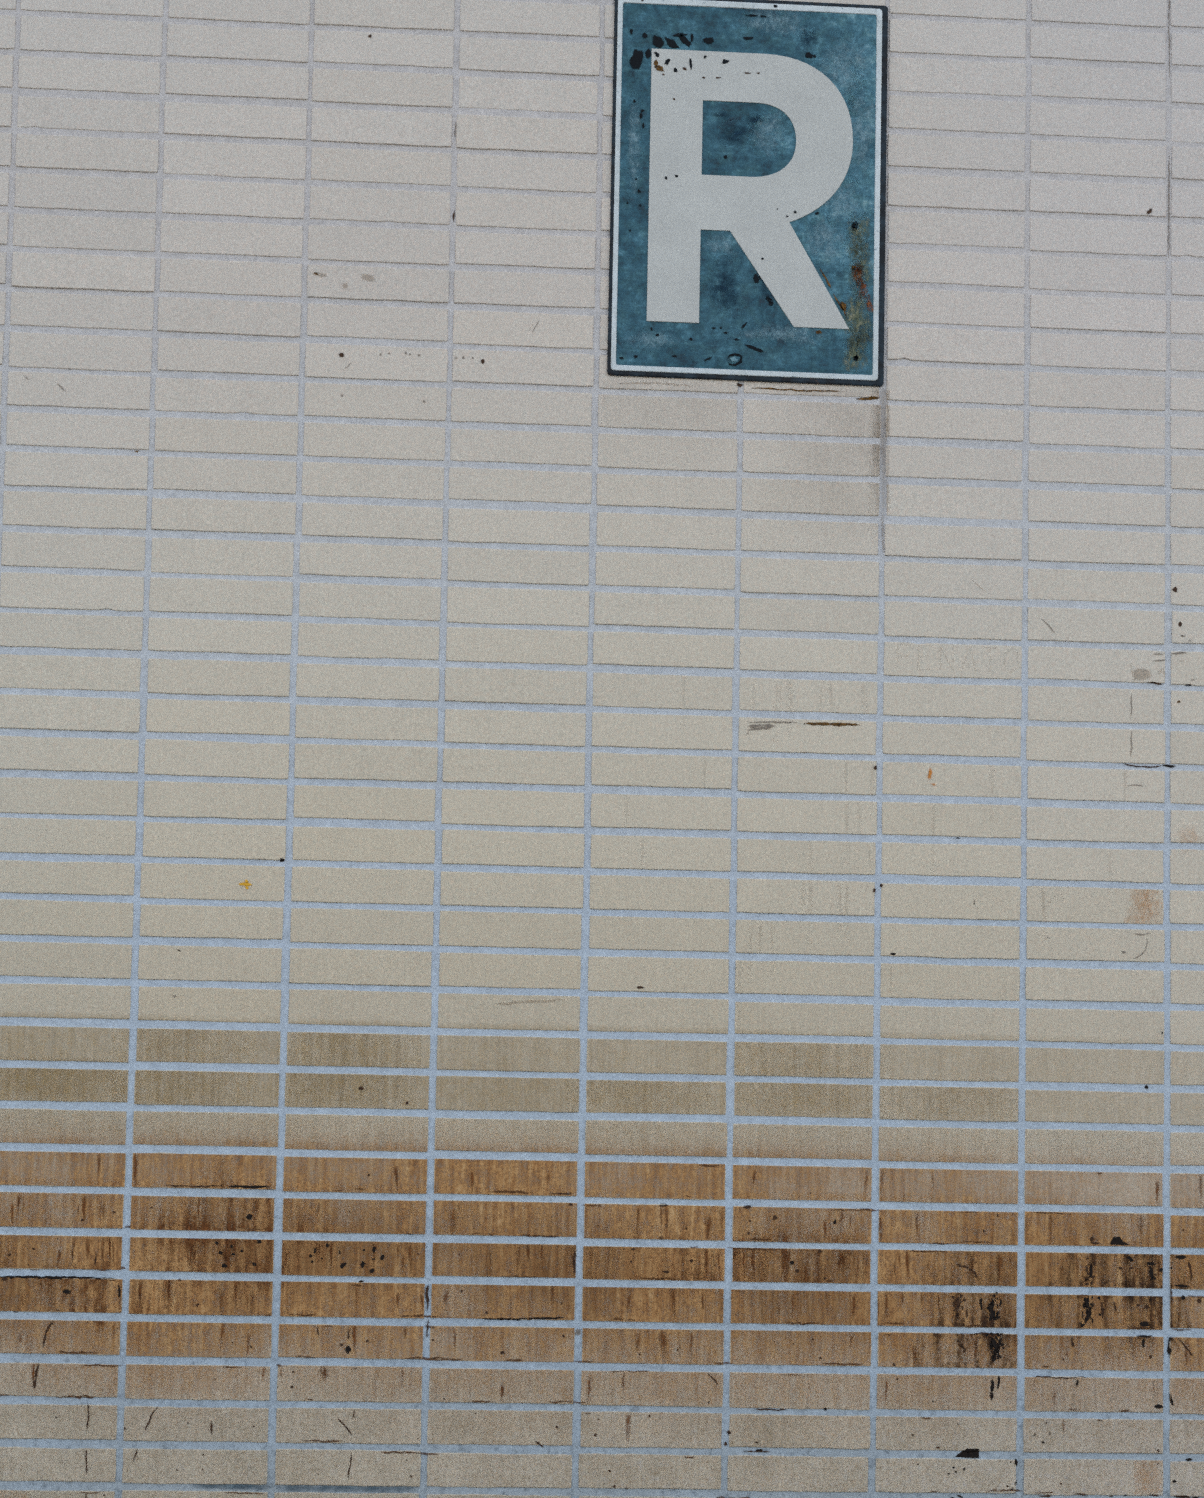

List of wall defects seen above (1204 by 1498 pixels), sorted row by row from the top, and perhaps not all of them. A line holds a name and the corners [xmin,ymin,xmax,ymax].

water stain [951,1292,1005,1401]
water stain [1071,1257,1116,1346]
water stain [1137,1335,1193,1356]